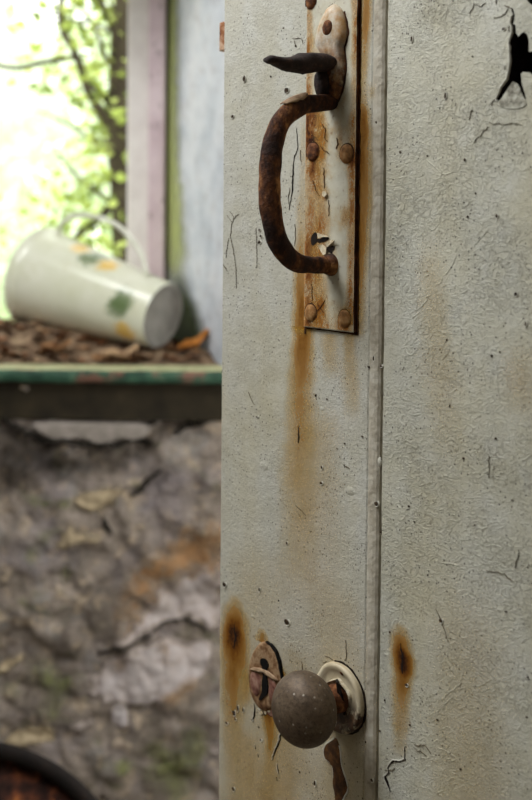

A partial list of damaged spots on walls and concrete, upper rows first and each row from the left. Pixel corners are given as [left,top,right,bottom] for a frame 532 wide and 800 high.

rust [352,0,370,71]
peeling [497,81,526,109]
crack [288,124,339,246]
crack [223,212,237,289]
rust [293,101,370,458]
rust [221,604,248,723]
rust [392,632,413,717]
rust [263,710,274,753]
peeling [323,738,349,800]
crack [383,744,431,792]